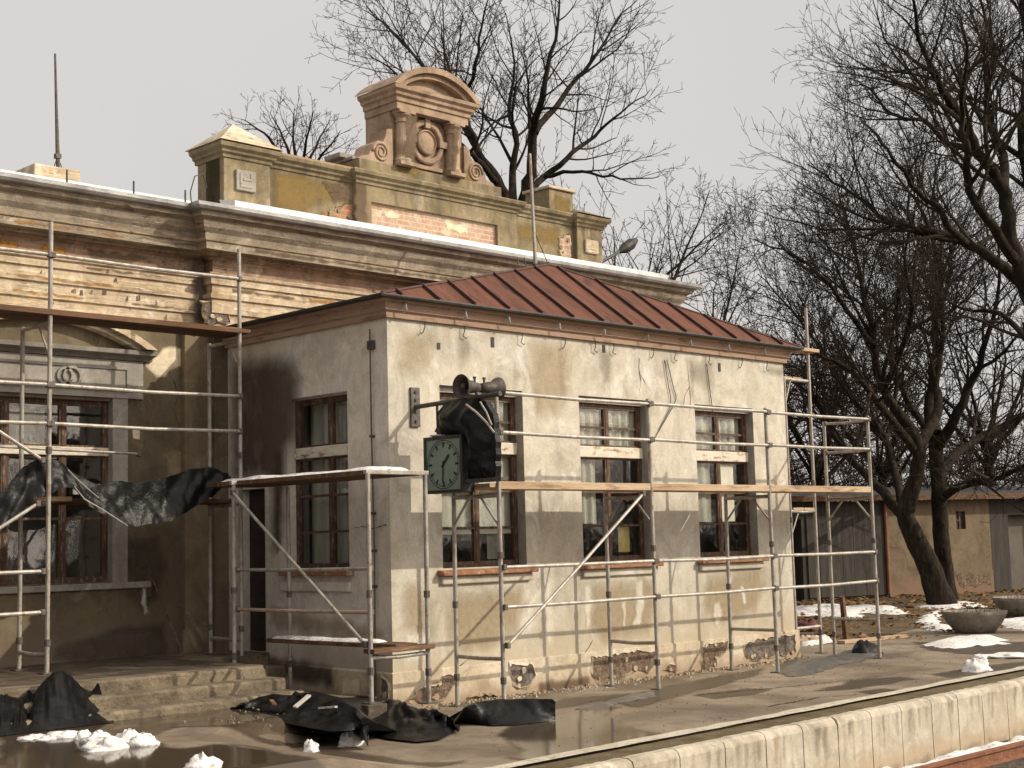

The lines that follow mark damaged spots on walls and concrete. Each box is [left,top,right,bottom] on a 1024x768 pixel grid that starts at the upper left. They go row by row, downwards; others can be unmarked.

spalling [318,202,354,221]
peeling [444,221,468,234]
spalling [557,233,573,258]
spalling [410,673,455,704]
spalling [508,662,538,690]
spalling [591,648,677,684]
spalling [700,640,729,669]
spalling [743,634,796,662]